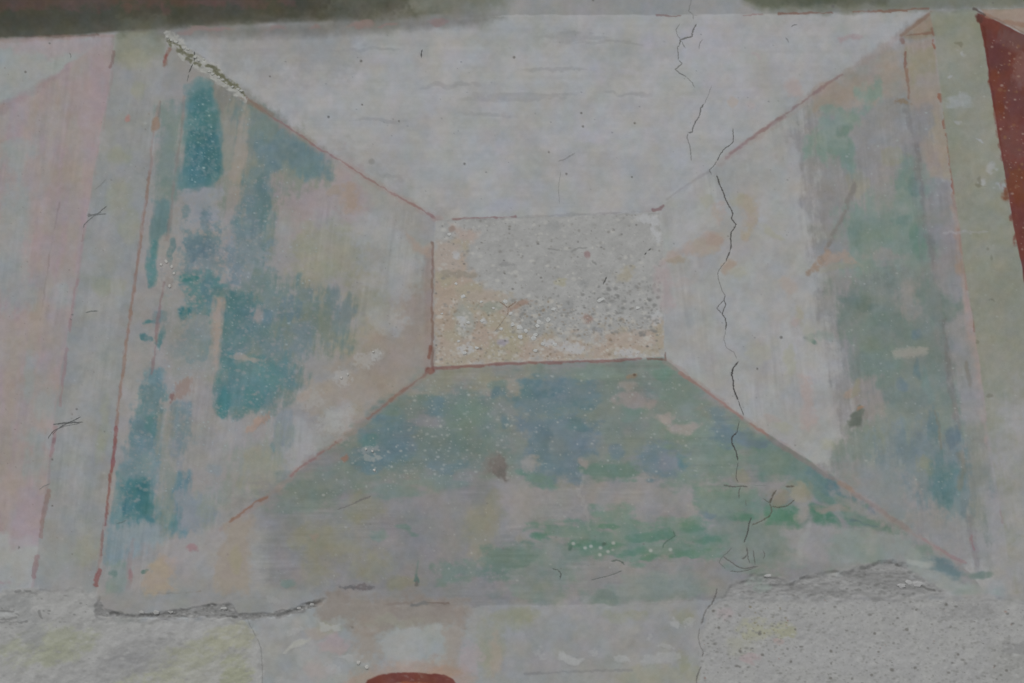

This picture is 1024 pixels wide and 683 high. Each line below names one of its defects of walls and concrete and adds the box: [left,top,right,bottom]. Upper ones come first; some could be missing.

flaking render [163,30,249,104]
crack [674,0,795,683]
flaking render [0,584,314,683]
flaking render [695,592,1024,683]